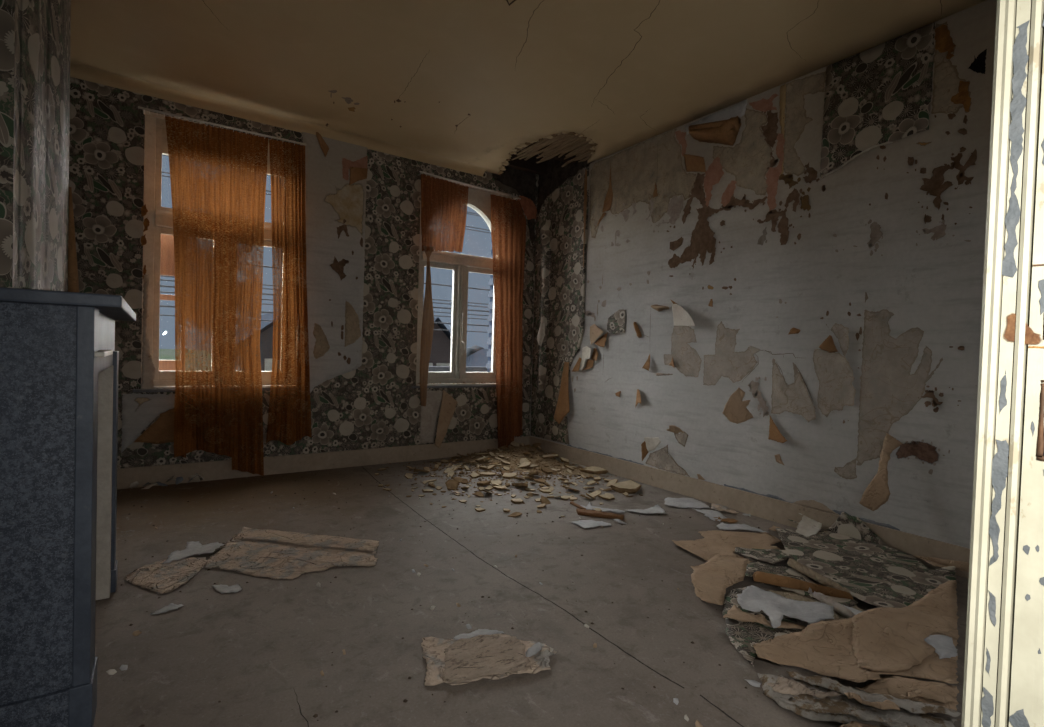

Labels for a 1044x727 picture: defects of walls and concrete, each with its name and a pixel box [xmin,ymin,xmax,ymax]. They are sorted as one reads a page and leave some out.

flaking render [667,110,826,275]
flaking render [907,113,977,246]
spalling [1002,20,1030,277]
flaking render [299,123,368,394]
peeling [554,275,608,424]
peeling [651,299,695,326]
peeling [722,377,787,465]
spalling [999,369,1007,414]
spalling [989,439,1009,566]
spalling [988,590,996,626]
spalling [981,686,994,727]
spalling [1009,709,1030,727]